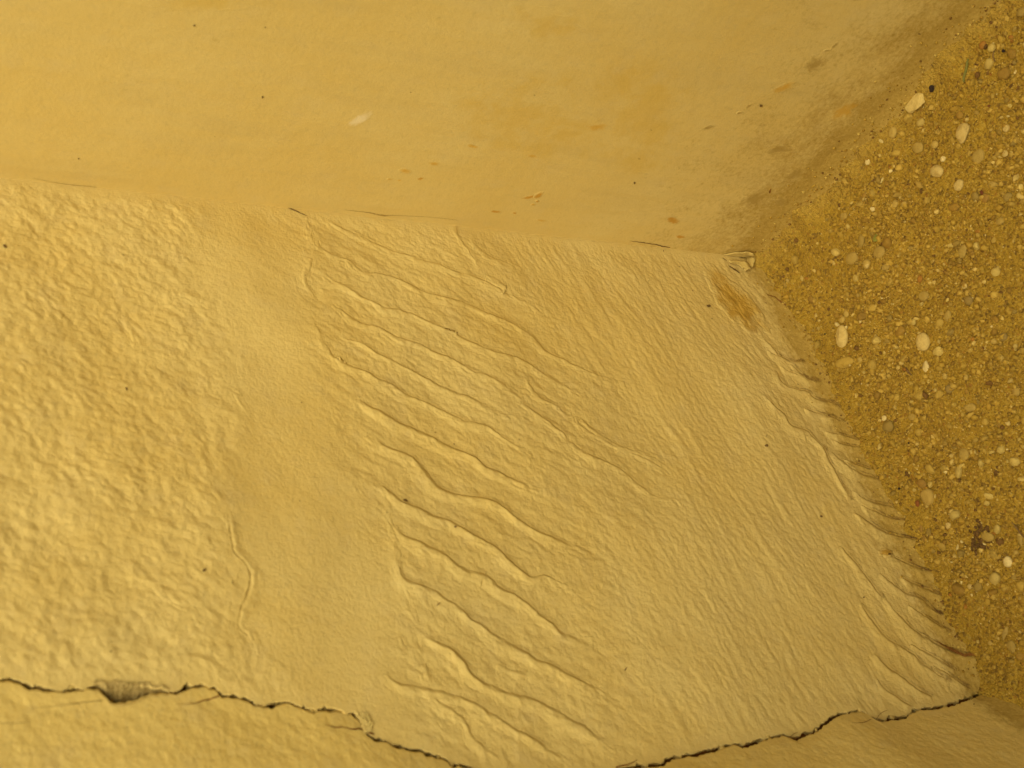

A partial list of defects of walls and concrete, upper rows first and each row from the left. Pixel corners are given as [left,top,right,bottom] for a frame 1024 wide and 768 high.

crack [21,685,103,723]
crack [177,686,234,704]
crack [308,709,399,749]
crack [616,695,975,768]